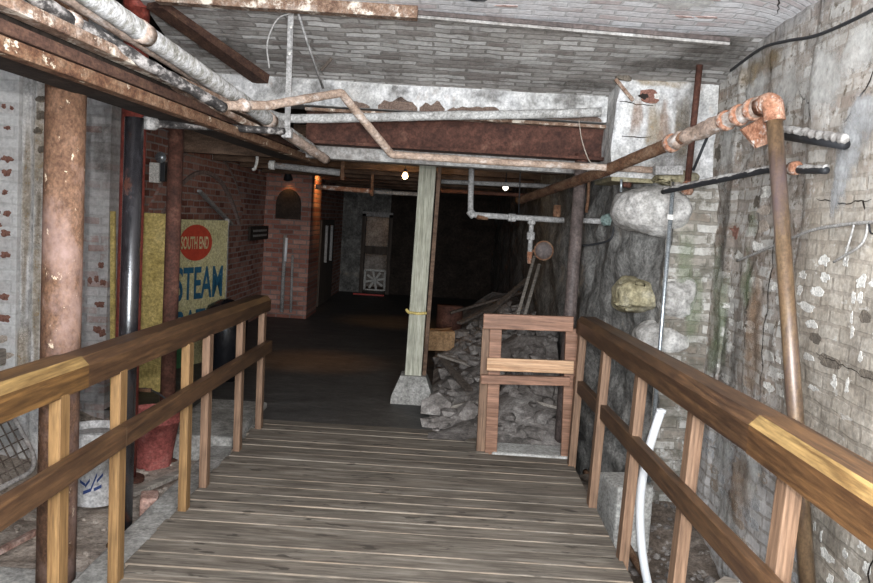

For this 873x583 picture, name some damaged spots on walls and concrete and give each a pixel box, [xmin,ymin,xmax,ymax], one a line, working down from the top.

spalling [354,97,499,112]
crack [844,72,873,123]